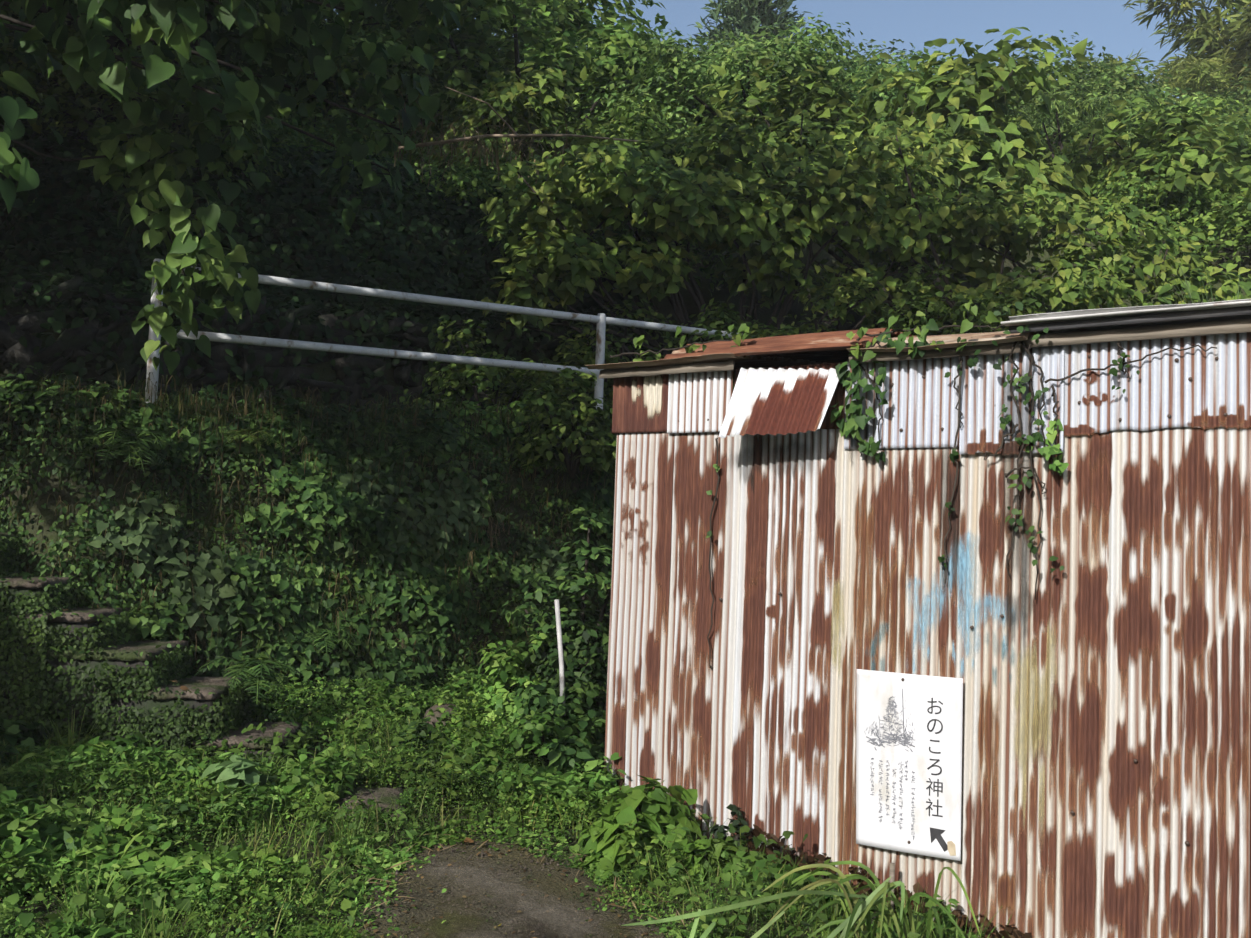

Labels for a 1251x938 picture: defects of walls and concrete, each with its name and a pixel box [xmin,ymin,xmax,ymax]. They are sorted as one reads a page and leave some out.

rust [612,433,727,839]
rust [726,370,1251,938]